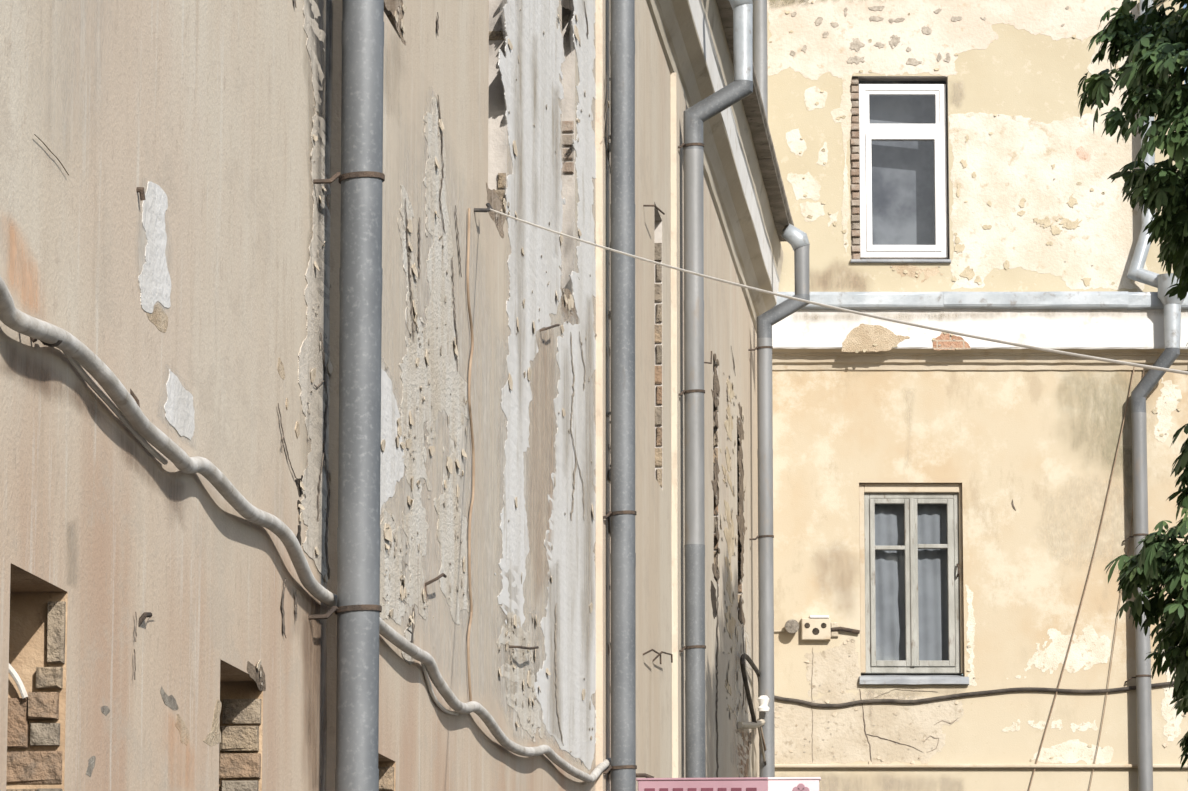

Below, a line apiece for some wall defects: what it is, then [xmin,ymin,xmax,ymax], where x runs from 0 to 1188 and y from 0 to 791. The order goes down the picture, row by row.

peeling [767,0,1148,292]
peeling [138,181,171,333]
peeling [162,369,195,442]
peeling [380,95,470,664]
peeling [486,0,611,770]
spalling [842,323,911,353]
spalling [932,332,971,350]
peeling [1152,378,1182,443]
peeling [710,354,752,778]
crack [808,649,816,763]
crack [860,689,958,762]
peeling [1006,624,1113,680]